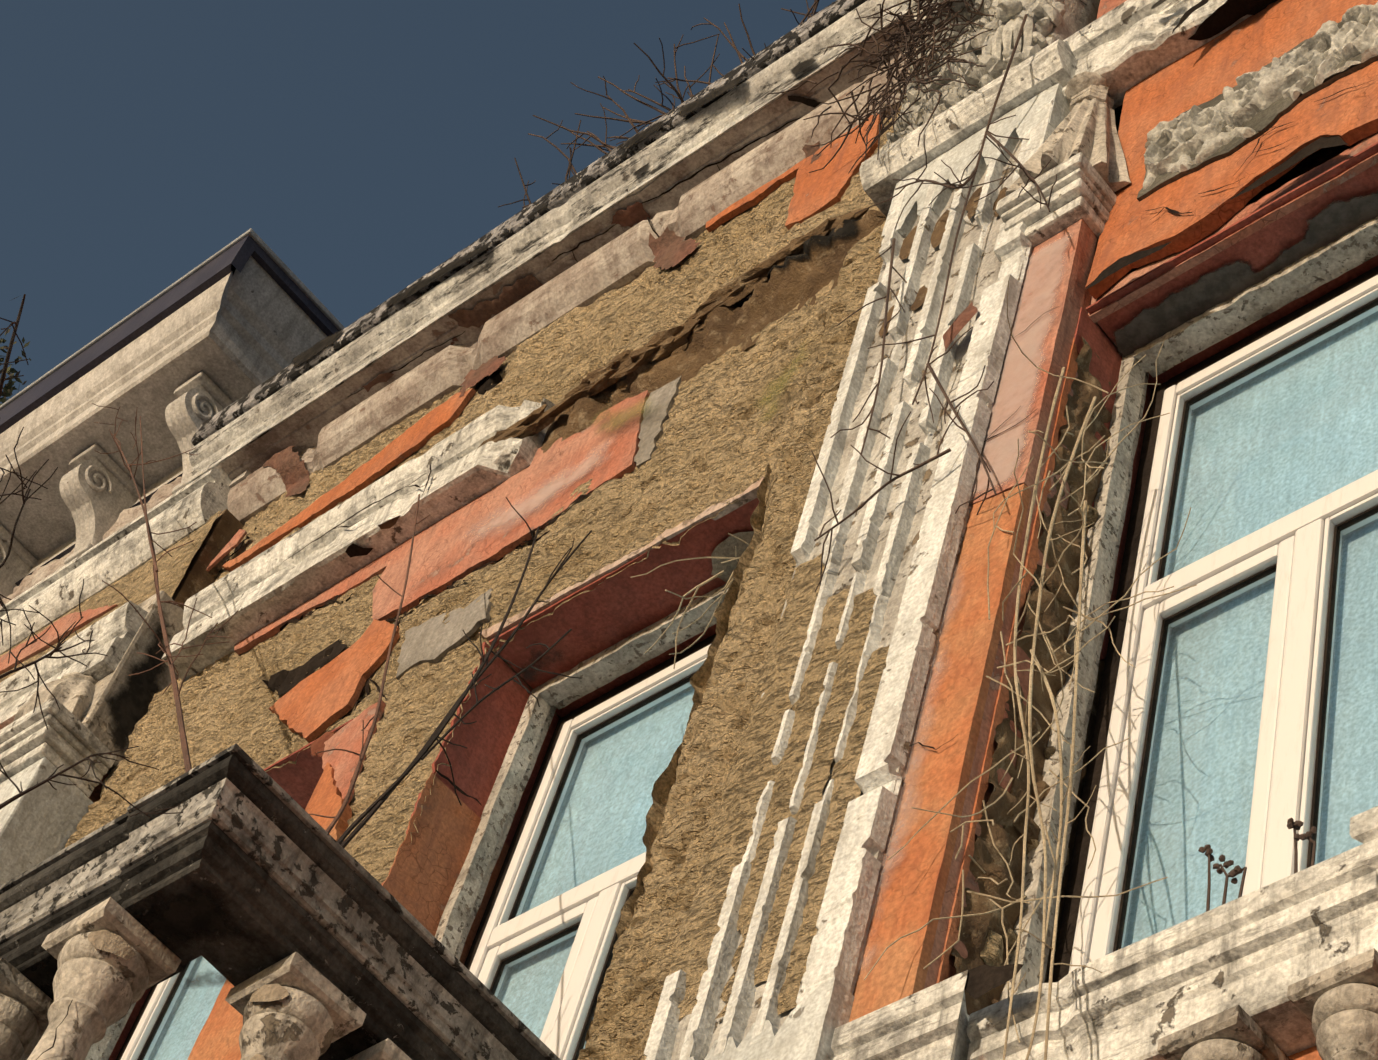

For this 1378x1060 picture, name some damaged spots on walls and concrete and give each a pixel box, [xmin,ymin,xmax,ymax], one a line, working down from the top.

flaking render [802,141,822,164]
flaking render [871,105,902,157]
flaking render [1151,0,1277,41]
flaking render [65,172,1008,1060]
flaking render [1017,337,1112,693]
flaking render [951,676,1056,1016]